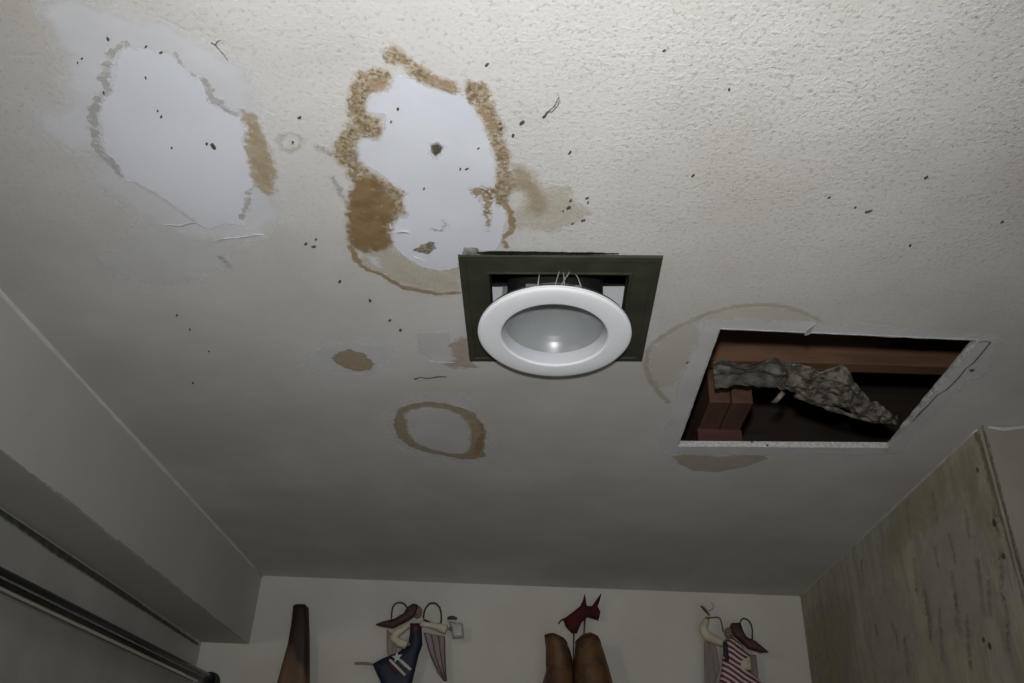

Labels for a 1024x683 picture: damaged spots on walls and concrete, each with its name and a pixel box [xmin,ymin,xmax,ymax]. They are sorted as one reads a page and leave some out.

peeling [36,0,284,286]
leakage [241,113,276,195]
peeling [356,74,525,271]
leakage [509,167,587,231]
leakage [307,344,392,373]
leakage [388,392,491,463]